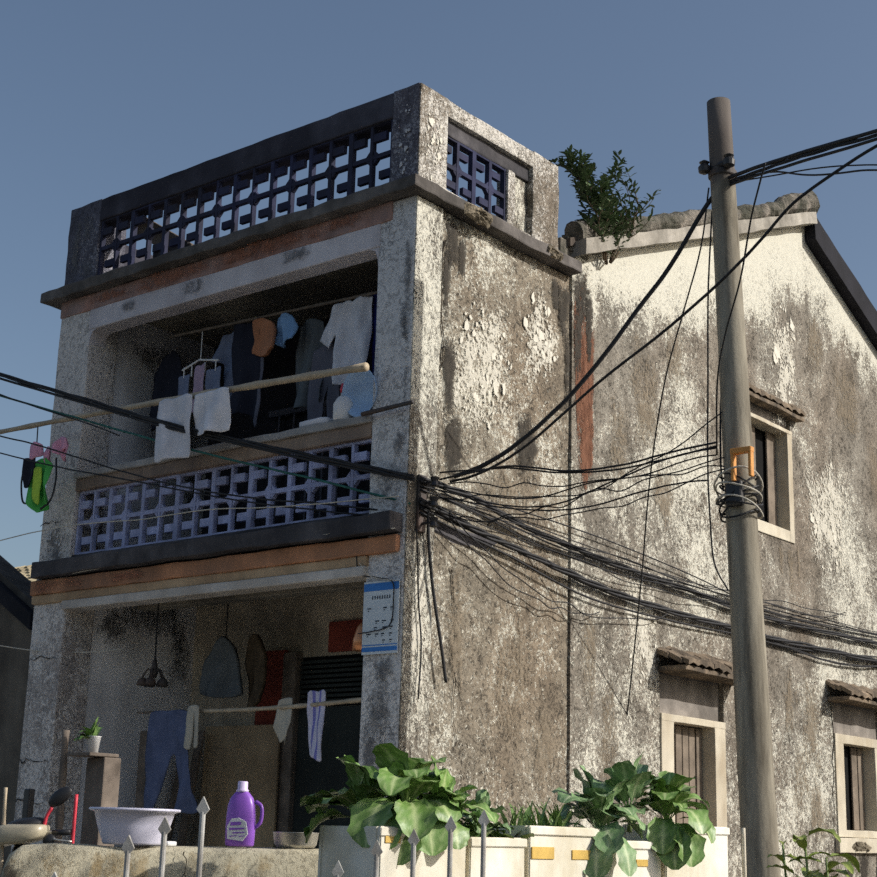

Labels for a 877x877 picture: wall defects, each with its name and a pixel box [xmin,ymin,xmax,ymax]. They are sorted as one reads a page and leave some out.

damp [444,215,467,323]
damp [443,338,463,479]
peeling [454,365,509,430]
peeling [455,301,512,370]
peeling [523,292,556,377]
damp [552,273,593,408]
rust [574,287,595,489]
damp [491,414,539,512]
damp [653,471,675,526]
damp [100,606,189,691]
damp [783,669,829,846]
damp [848,856,877,877]